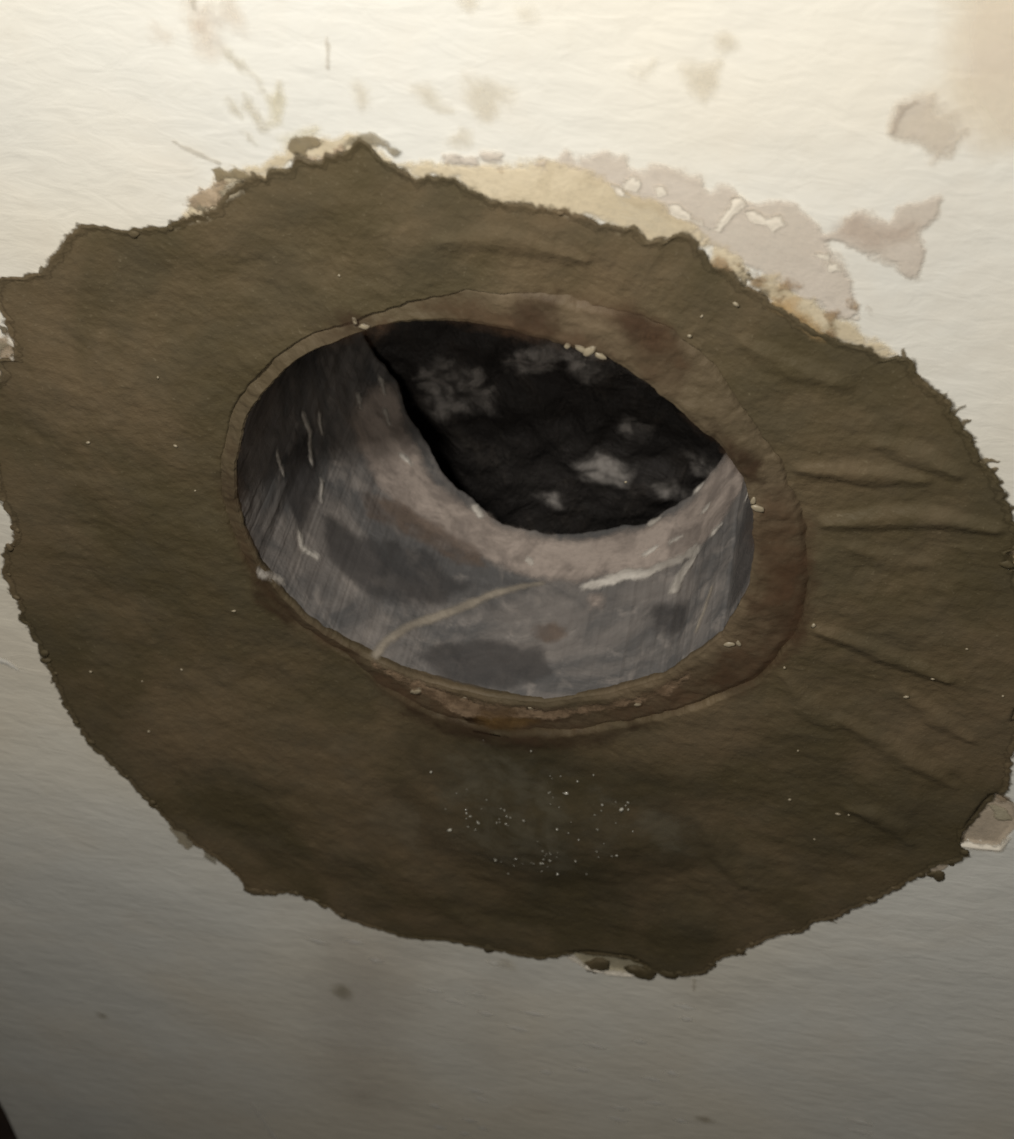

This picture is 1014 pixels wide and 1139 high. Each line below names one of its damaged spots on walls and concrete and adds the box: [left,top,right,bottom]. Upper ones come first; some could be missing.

peeling [891,99,953,153]
peeling [184,133,940,358]
damp [506,347,596,378]
damp [419,369,490,419]
damp [302,411,323,465]
damp [578,453,629,486]
damp [257,567,283,583]
damp [298,530,319,560]
damp [581,536,699,605]
flaking render [960,794,1014,852]